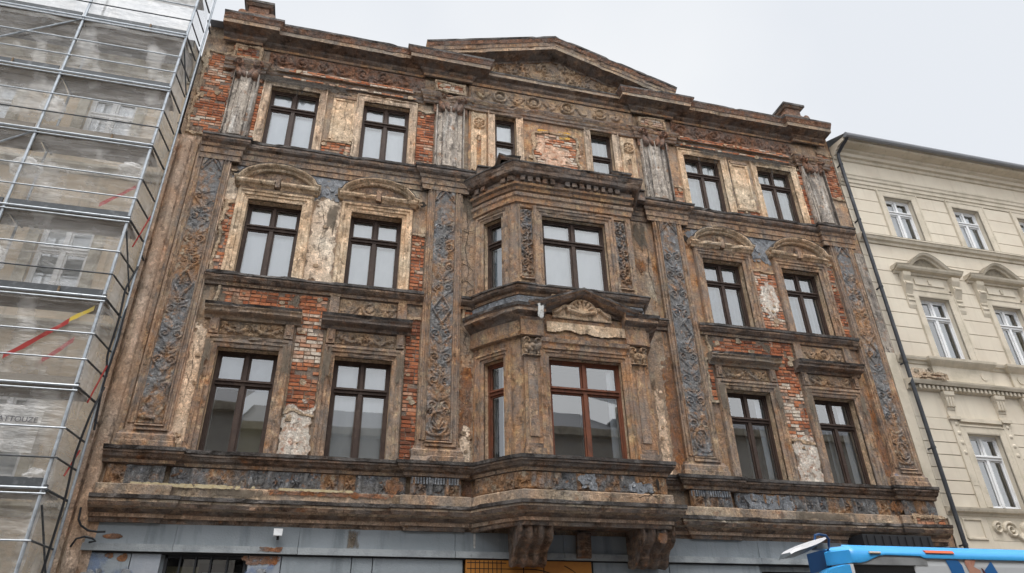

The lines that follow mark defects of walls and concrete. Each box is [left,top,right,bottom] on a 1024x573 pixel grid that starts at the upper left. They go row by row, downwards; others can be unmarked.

flaking render [185,43,264,137]
flaking render [277,67,435,164]
flaking render [529,131,583,170]
flaking render [208,165,244,270]
flaking render [409,233,425,291]
flaking render [213,285,329,455]
flaking render [703,237,833,483]